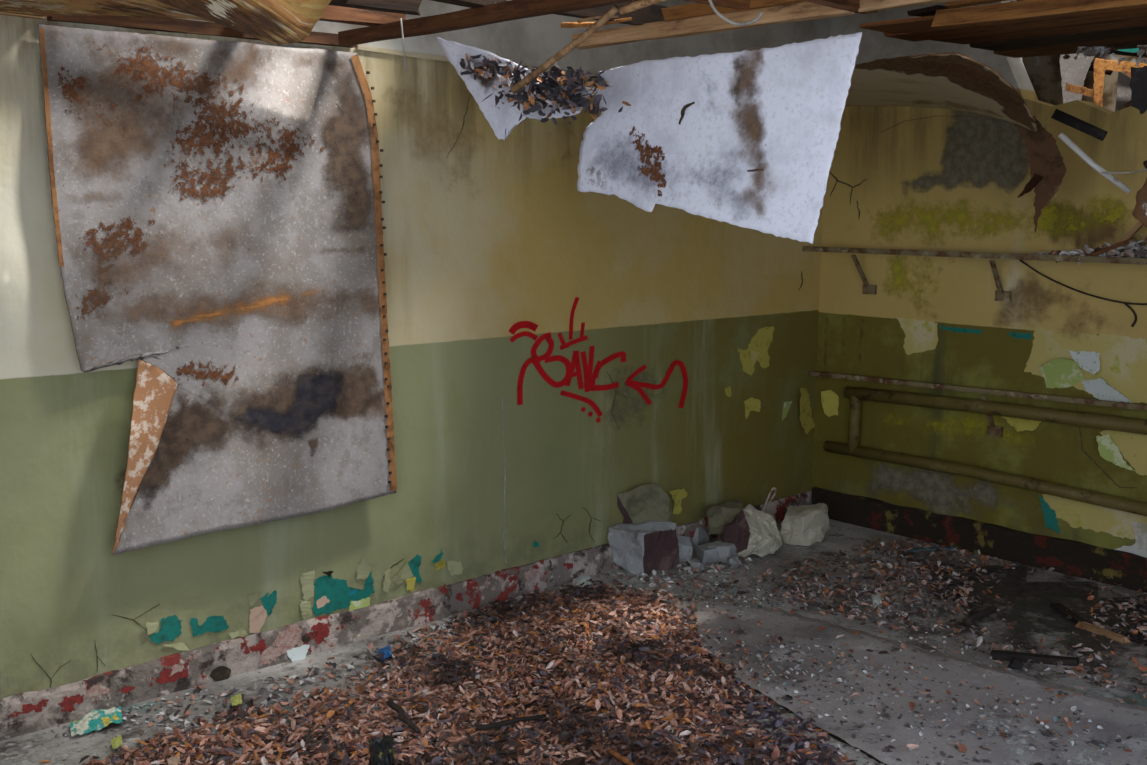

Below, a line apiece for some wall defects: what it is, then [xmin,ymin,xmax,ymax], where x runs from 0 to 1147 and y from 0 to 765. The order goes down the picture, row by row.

peeling [629,126,668,197]
damp [1052,204,1119,249]
peeling [738,326,775,376]
peeling [897,318,985,355]
peeling [1007,326,1147,404]
peeling [782,388,839,434]
peeling [1002,416,1042,432]
peeling [1096,430,1147,476]
peeling [1039,494,1147,558]
peeling [146,548,463,666]
peeling [150,664,231,687]
peeling [10,683,135,718]